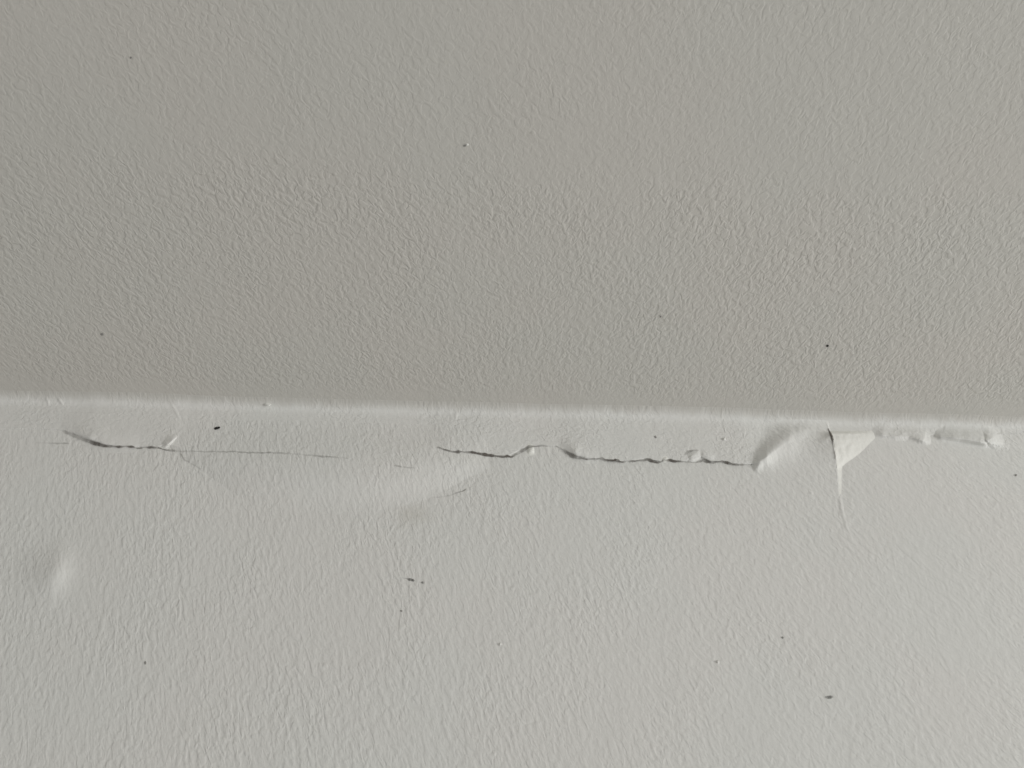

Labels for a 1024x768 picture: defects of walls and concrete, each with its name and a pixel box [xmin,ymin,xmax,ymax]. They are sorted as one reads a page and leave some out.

crack [59,412,165,453]
crack [443,436,736,465]